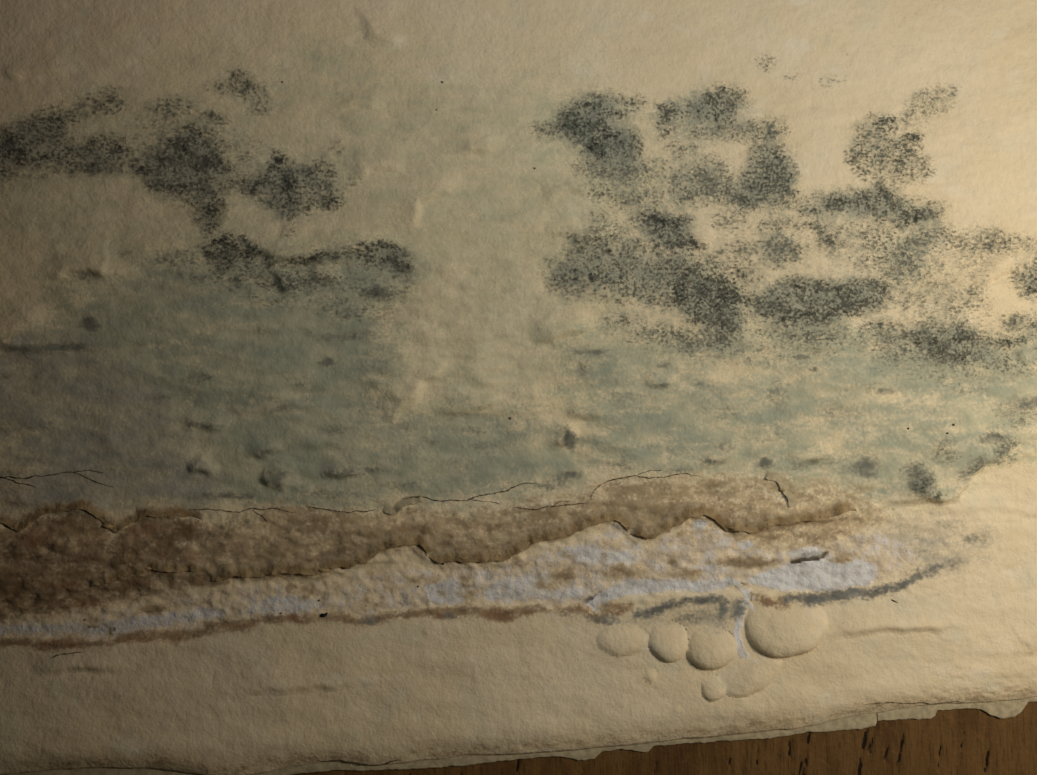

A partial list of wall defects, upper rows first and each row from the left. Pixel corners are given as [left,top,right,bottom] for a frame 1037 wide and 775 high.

damp [0,85,1037,619]
crack [0,470,113,487]
spalling [0,470,922,639]
damp [634,584,765,663]